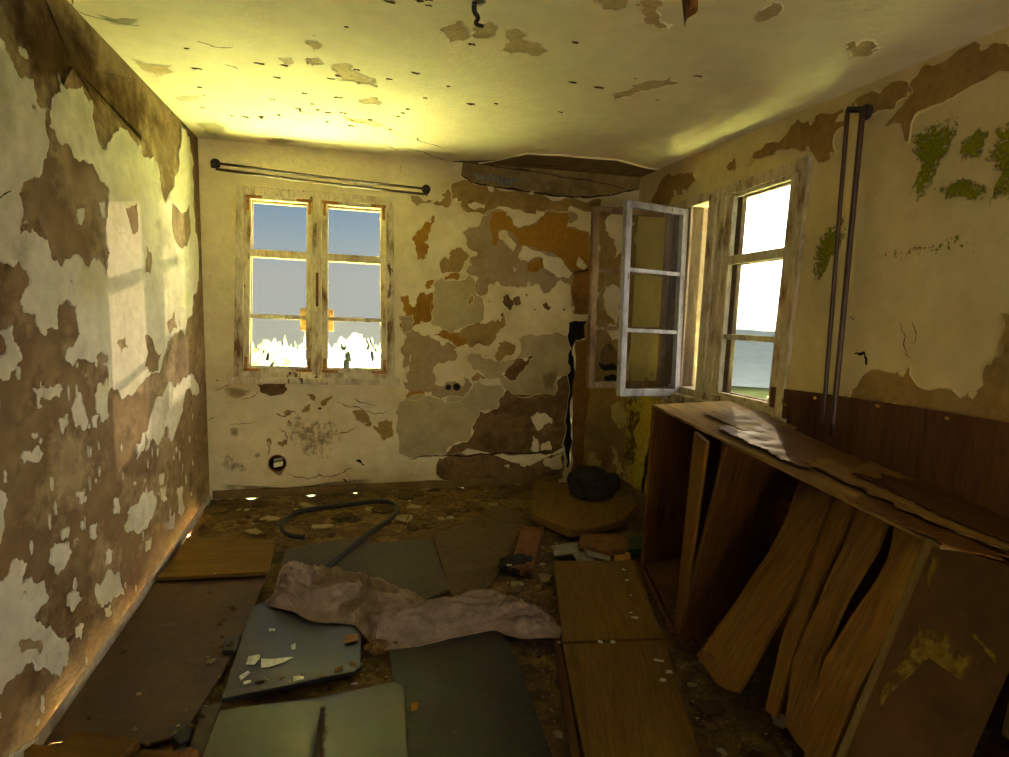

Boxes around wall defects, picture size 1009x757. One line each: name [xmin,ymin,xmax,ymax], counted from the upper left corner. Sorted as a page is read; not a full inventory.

peeling [274,40,393,105]
peeling [297,92,391,130]
peeling [438,19,549,56]
peeling [593,0,674,29]
peeling [726,39,1009,172]
leakage [912,118,1009,201]
peeling [0,38,199,552]
peeling [399,152,696,480]
peeling [845,313,1009,422]
peeling [48,441,101,575]
peeling [0,540,84,694]
peeling [95,549,137,617]